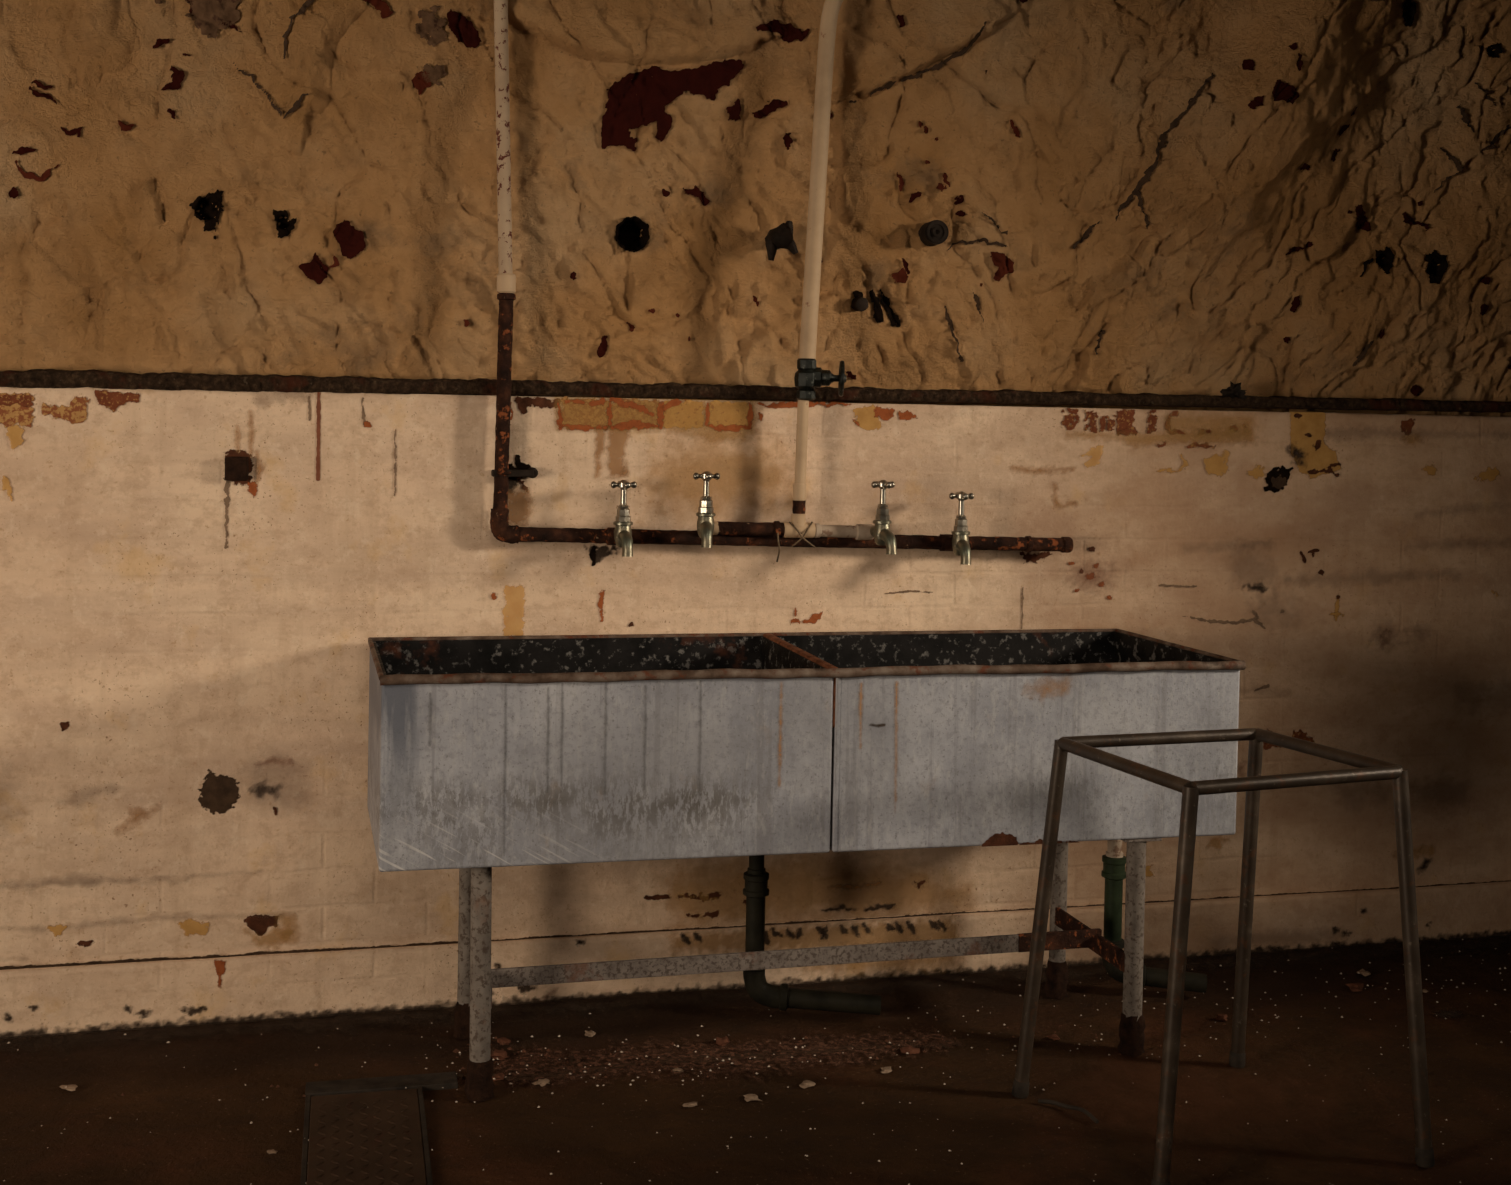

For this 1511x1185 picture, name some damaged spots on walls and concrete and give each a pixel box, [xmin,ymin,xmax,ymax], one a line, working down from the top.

crack [849,21,987,103]
peeling [601,59,788,151]
peeling [783,133,793,150]
peeling [298,220,366,285]
peeling [0,390,140,449]
corrosion [308,392,321,481]
peeling [510,396,918,439]
peeling [1061,408,1252,477]
peeling [1248,412,1341,493]
peeling [244,914,285,944]